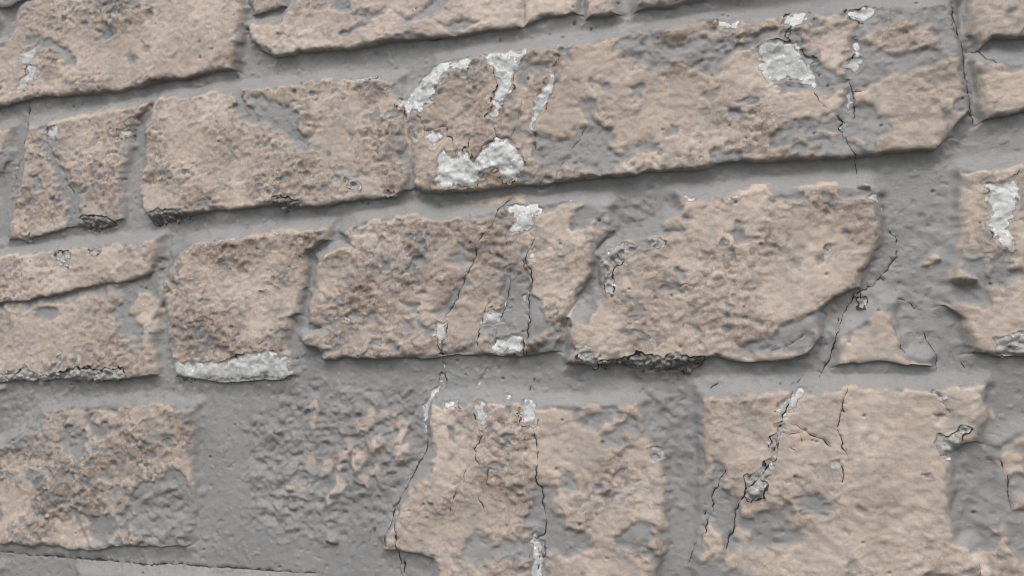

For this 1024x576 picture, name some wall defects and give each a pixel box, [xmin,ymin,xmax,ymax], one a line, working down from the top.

peeling [394,48,527,119]
peeling [756,13,819,88]
crack [951,6,999,124]
peeling [425,128,526,193]
peeling [503,203,542,233]
peeling [980,171,1023,252]
crack [444,196,535,354]
peeling [169,347,292,383]
spalling [574,345,705,375]
crack [689,225,965,561]
crack [374,443,428,573]
crack [533,430,547,570]